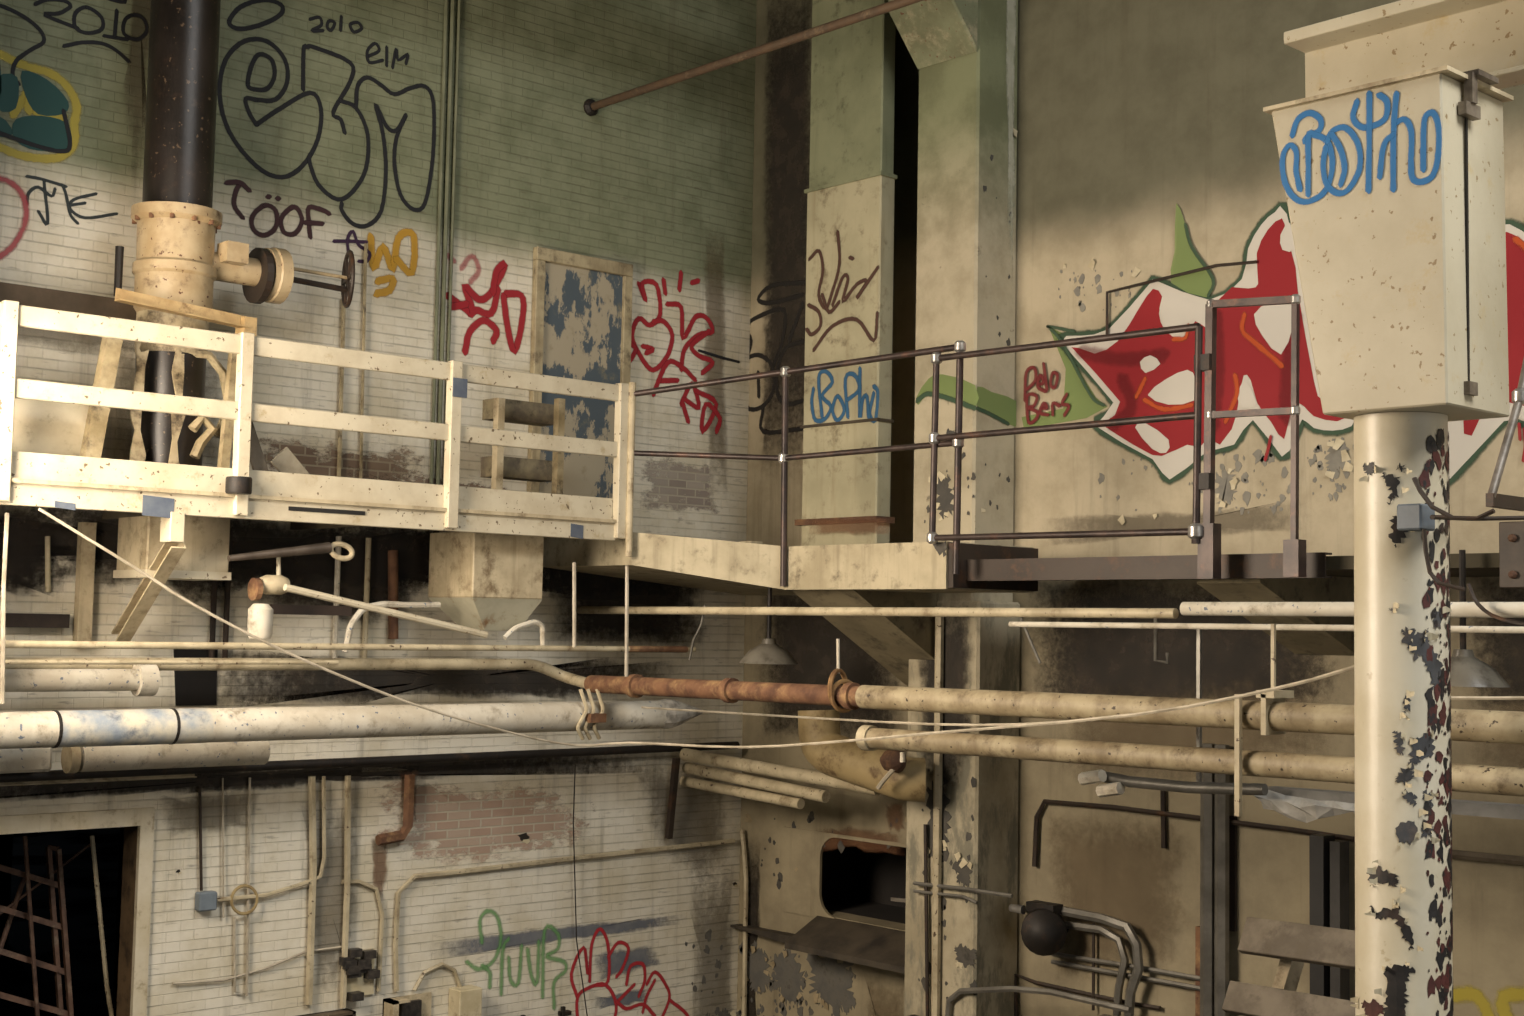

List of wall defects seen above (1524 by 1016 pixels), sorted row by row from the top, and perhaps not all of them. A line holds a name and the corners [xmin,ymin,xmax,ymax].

peeling [1098,473,1157,525]
peeling [1189,449,1290,515]
peeling [1307,428,1454,1016]
flaking render [381,782,589,863]